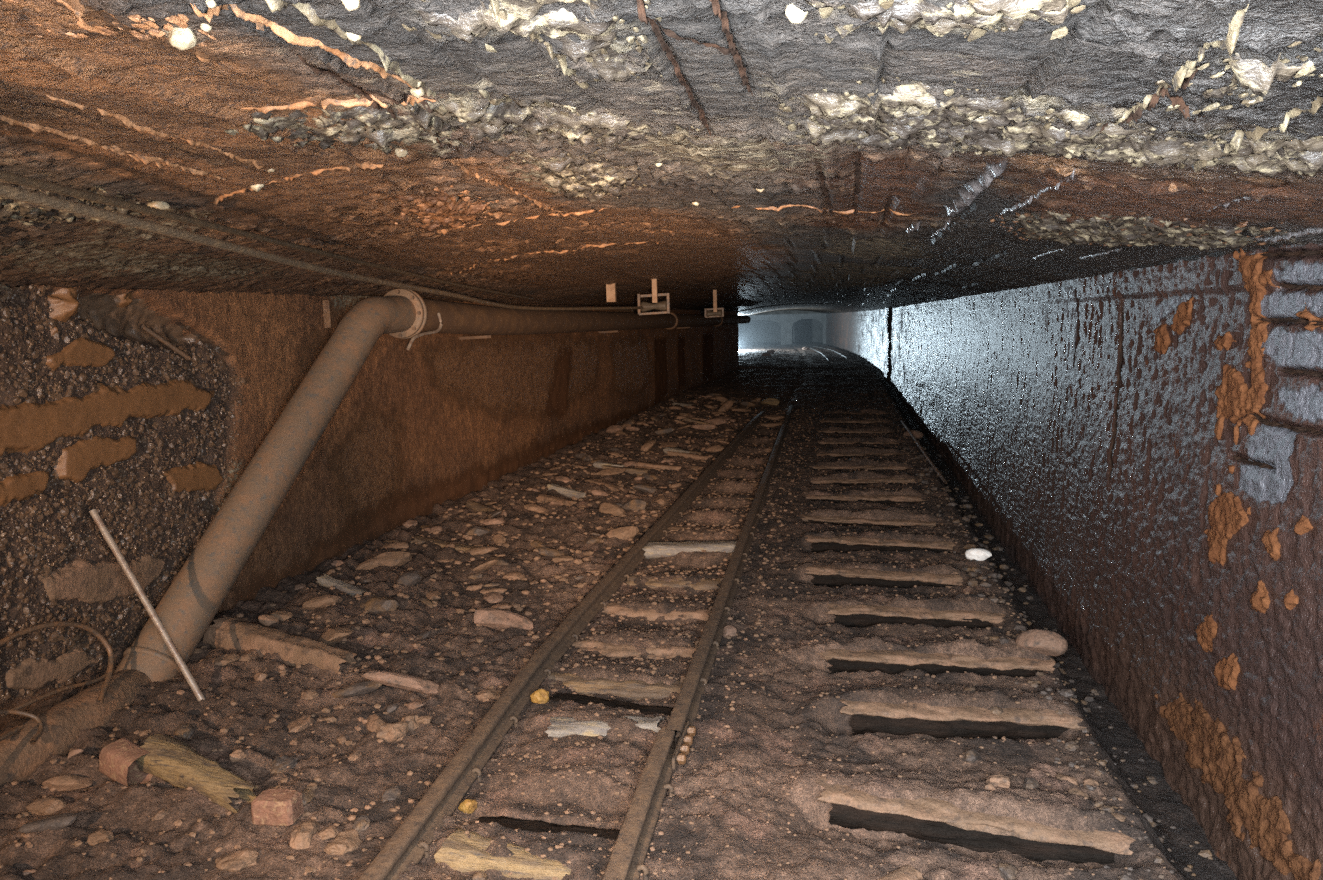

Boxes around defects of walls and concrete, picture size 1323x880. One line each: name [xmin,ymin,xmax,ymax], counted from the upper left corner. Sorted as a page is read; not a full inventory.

spalling [224,89,699,203]
spalling [777,77,1323,178]
spalling [1166,41,1323,115]
peeling [1295,302,1323,332]
peeling [1204,465,1251,566]
peeling [1261,515,1313,561]